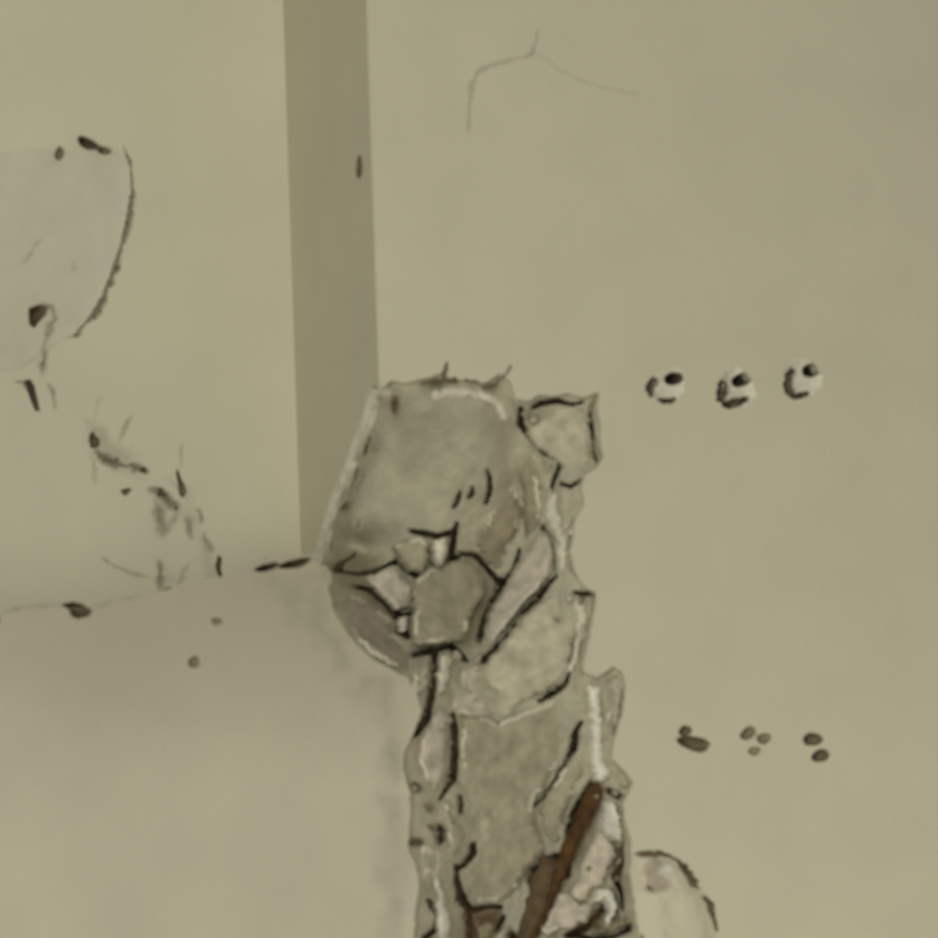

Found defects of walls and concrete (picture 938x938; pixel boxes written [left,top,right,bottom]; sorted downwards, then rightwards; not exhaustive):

crack [21,379,40,411]
crack [89,431,187,503]
crack [214,555,222,577]
crack [254,557,312,572]
spalling [311,362,636,938]